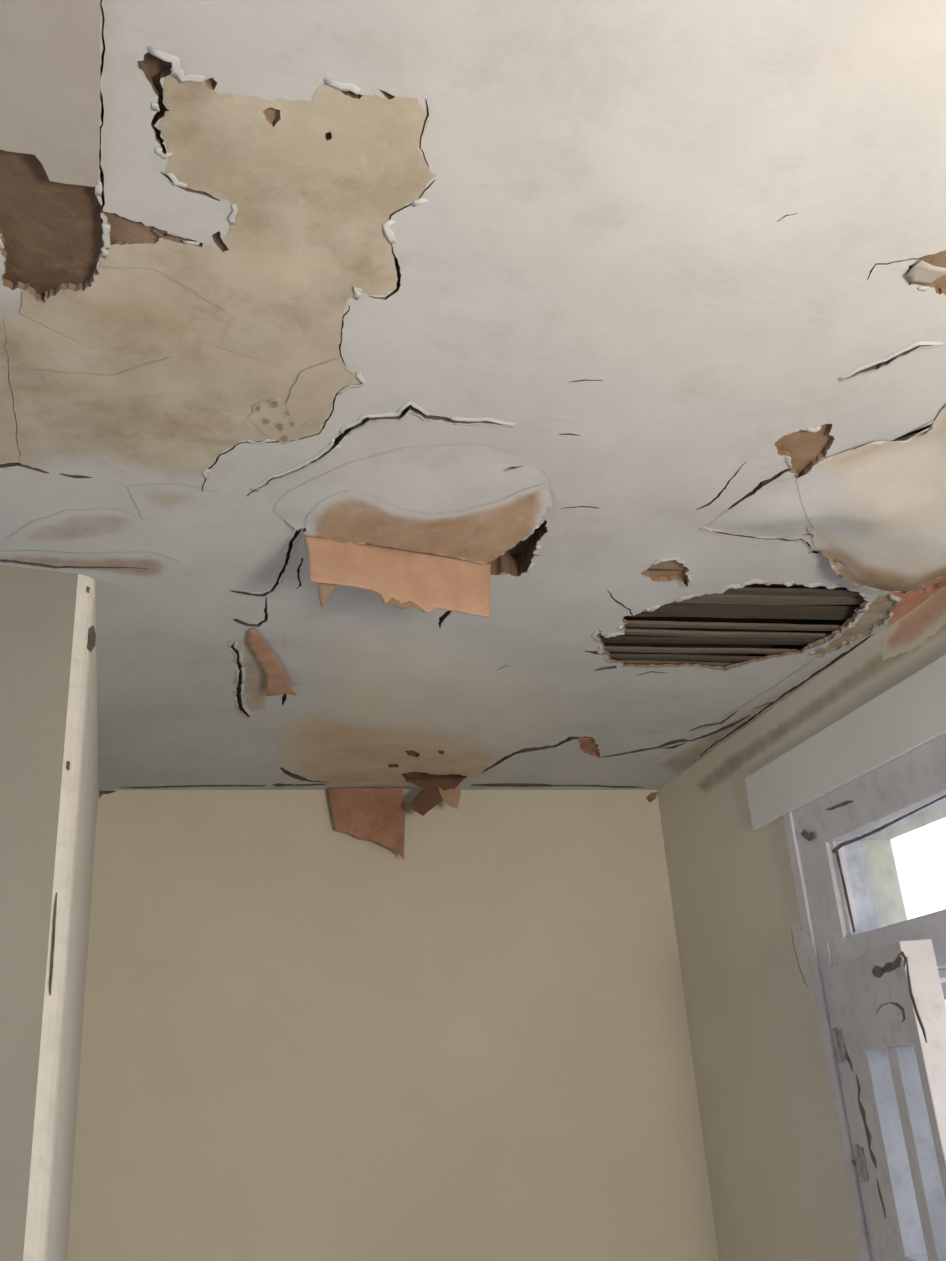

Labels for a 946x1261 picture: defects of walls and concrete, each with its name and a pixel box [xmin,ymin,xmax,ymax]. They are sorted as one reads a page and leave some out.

peeling [0,46,437,492]
flaking render [905,250,946,295]
leakage [0,268,261,412]
leakage [248,358,352,445]
crack [247,401,515,497]
flaking render [728,424,835,509]
crack [230,528,303,627]
peeling [521,526,542,573]
flaking render [585,557,906,672]
peeling [226,628,297,718]
spalling [388,750,420,768]